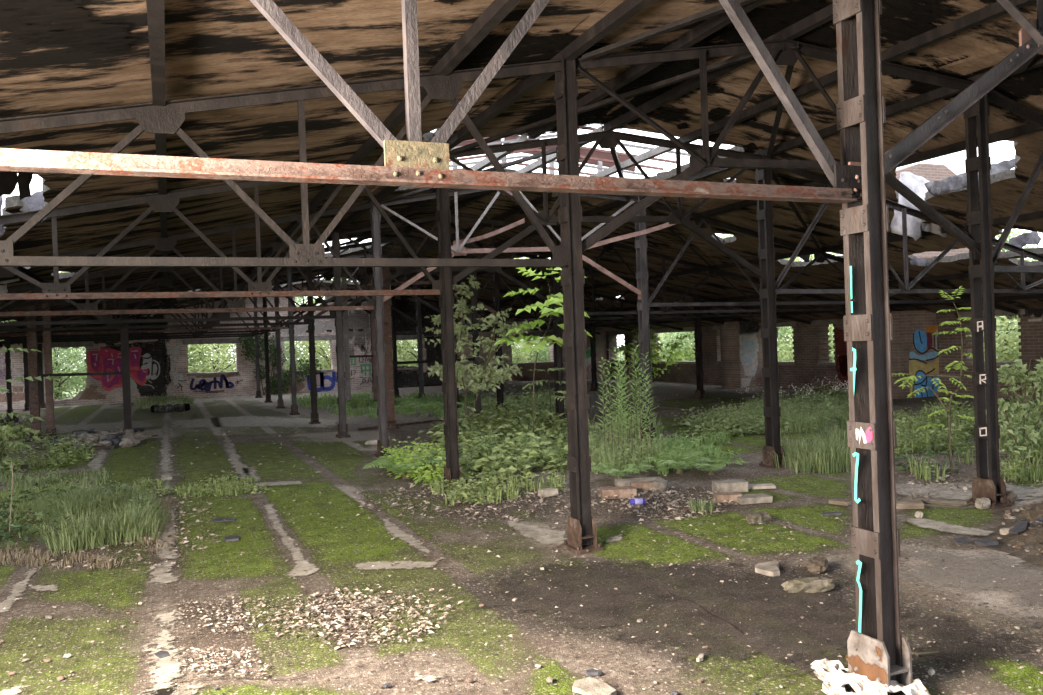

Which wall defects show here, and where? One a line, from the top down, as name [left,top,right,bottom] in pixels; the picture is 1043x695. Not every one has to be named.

corrosion [846,647,889,695]